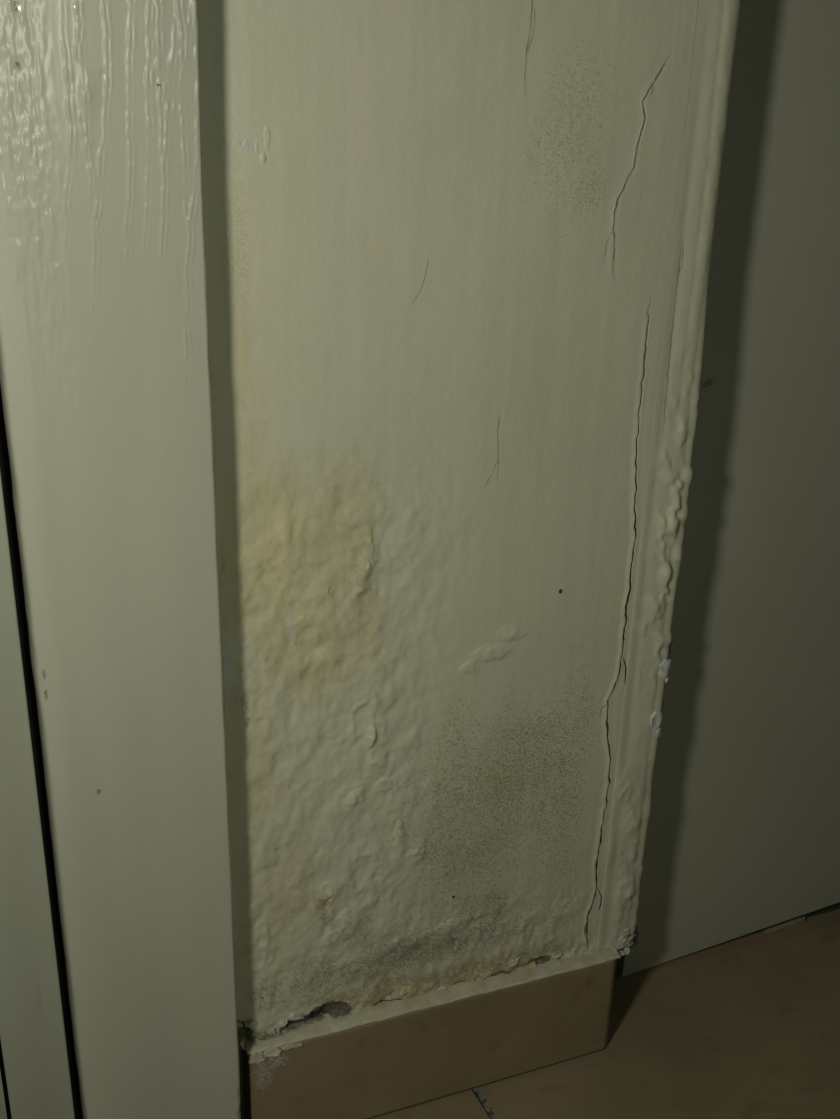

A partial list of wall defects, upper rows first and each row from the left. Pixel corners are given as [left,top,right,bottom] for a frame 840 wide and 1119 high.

crack [584,243,684,947]
spalling [237,927,639,1093]